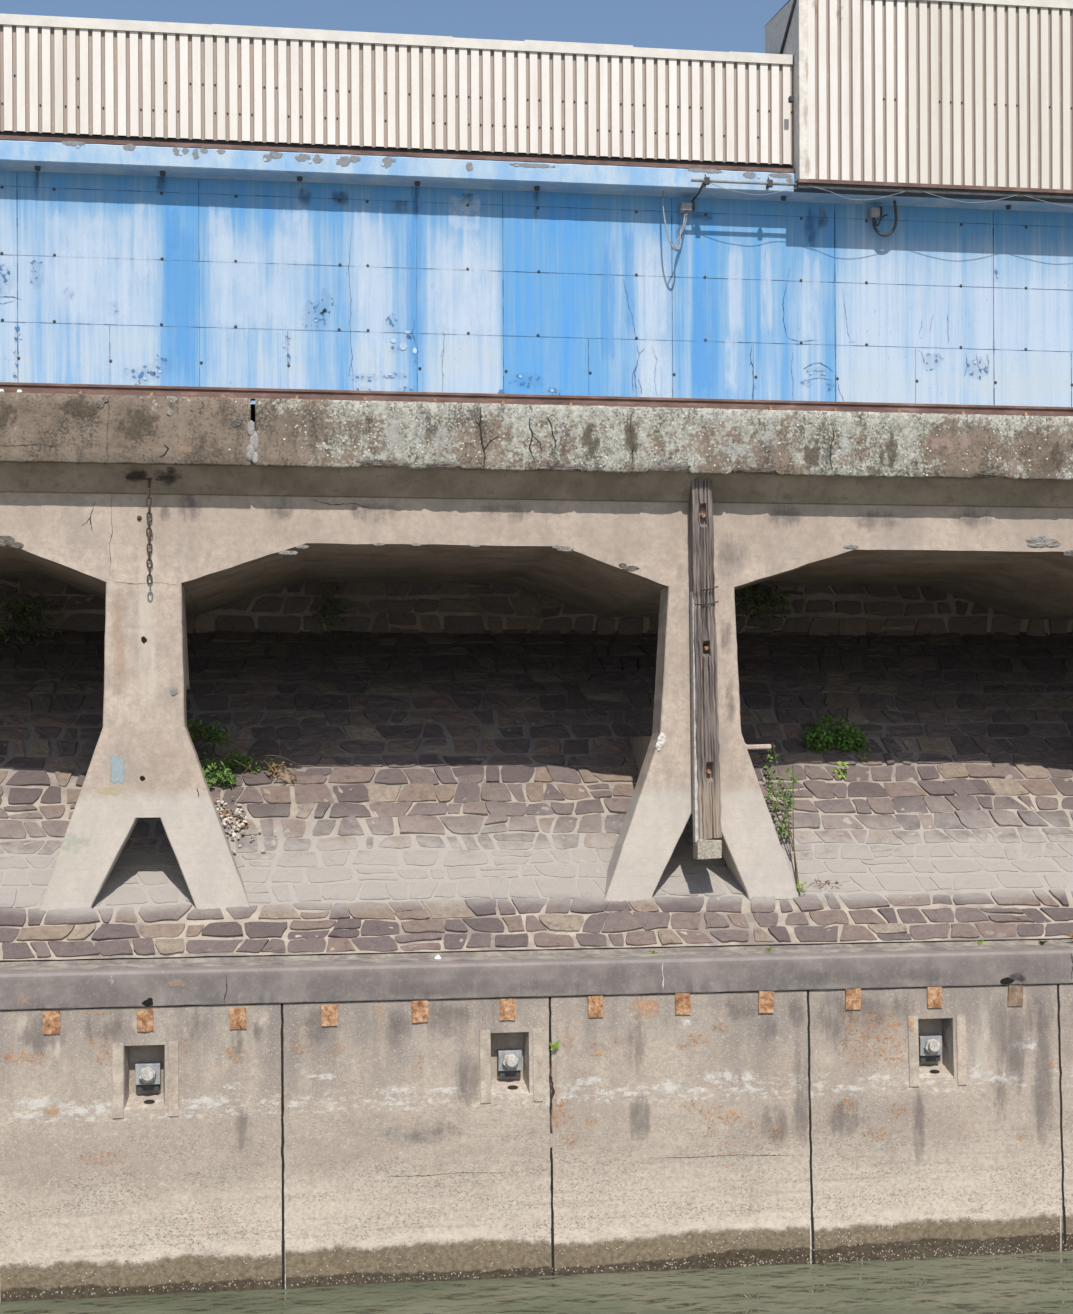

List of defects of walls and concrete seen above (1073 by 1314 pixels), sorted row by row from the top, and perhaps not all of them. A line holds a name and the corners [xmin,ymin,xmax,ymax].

peeling [173,147,225,159]
peeling [263,151,361,167]
damp [0,401,17,426]
damp [118,408,159,440]
crack [476,407,498,469]
crack [529,416,556,459]
spalling [0,536,24,549]
spalling [1026,535,1073,557]
corrosion [840,1007,914,1066]